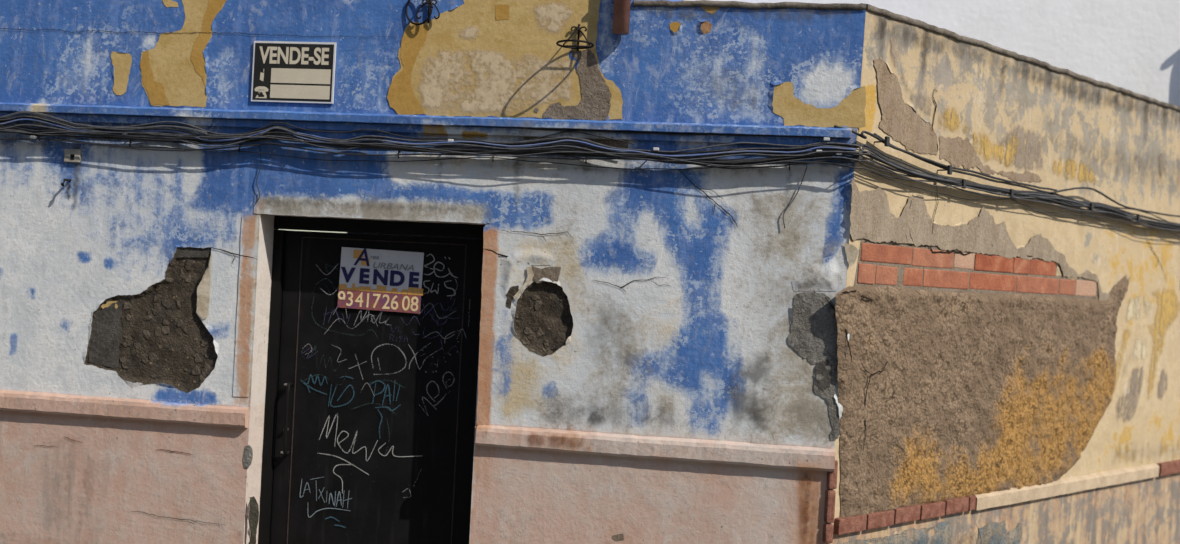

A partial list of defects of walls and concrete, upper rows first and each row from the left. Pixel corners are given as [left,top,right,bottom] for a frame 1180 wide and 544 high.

peeling [111,0,227,108]
peeling [387,0,623,121]
peeling [523,137,629,150]
peeling [768,39,1043,183]
flaking render [850,179,1110,301]
flaking render [82,245,219,393]
flaking render [506,265,573,356]
peeling [788,292,850,440]
flaking render [834,496,976,544]
peeling [977,520,1023,544]